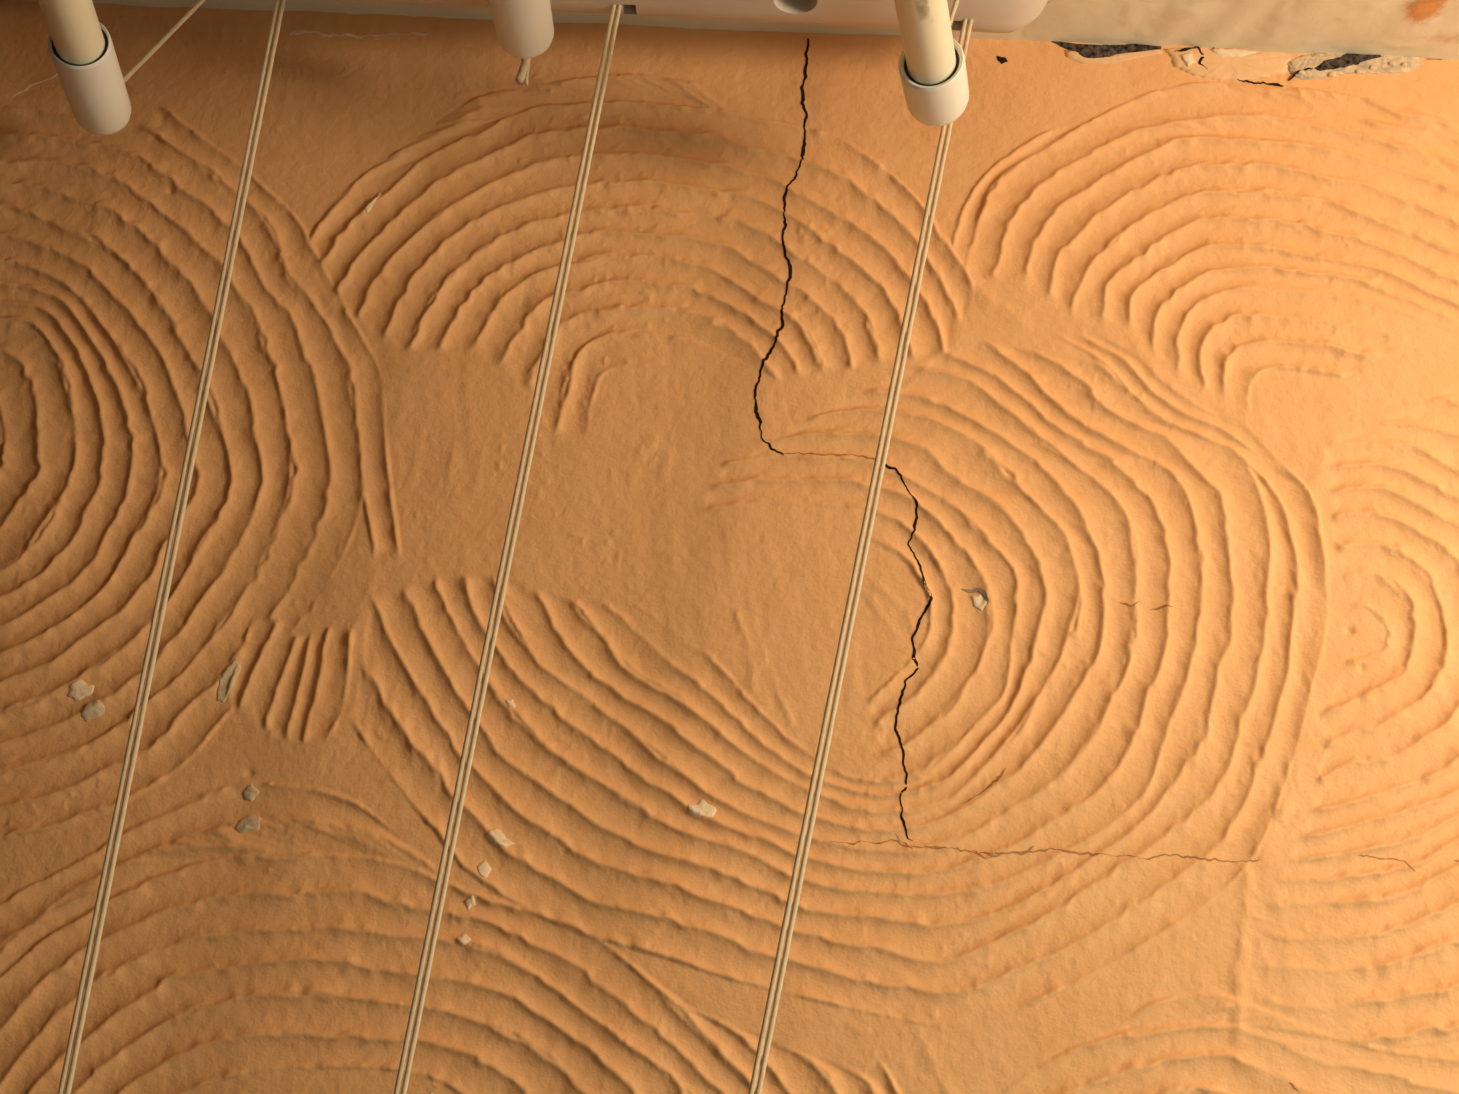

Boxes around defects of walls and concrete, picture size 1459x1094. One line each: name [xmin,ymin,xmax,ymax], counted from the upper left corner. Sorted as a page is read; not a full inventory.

flaking render [1064,46,1423,87]
crack [754,38,1260,862]
crack [1358,855,1416,872]